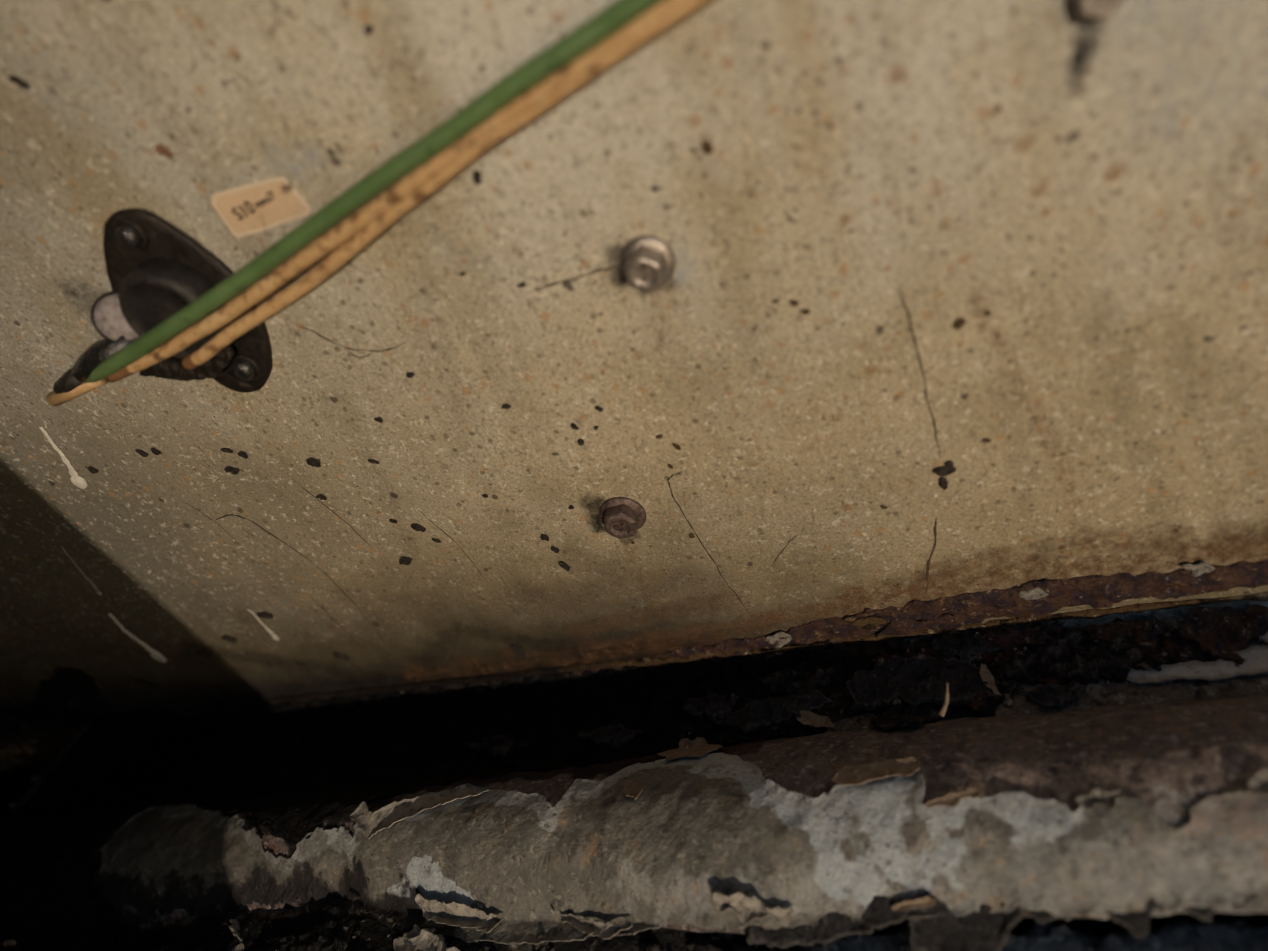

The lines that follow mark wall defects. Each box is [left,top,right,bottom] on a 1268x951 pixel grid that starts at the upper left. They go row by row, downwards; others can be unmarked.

crack [897,286,941,456]
crack [667,471,754,621]
rust [406,531,1268,691]
crack [926,517,937,595]
peeling [83,617,1268,951]